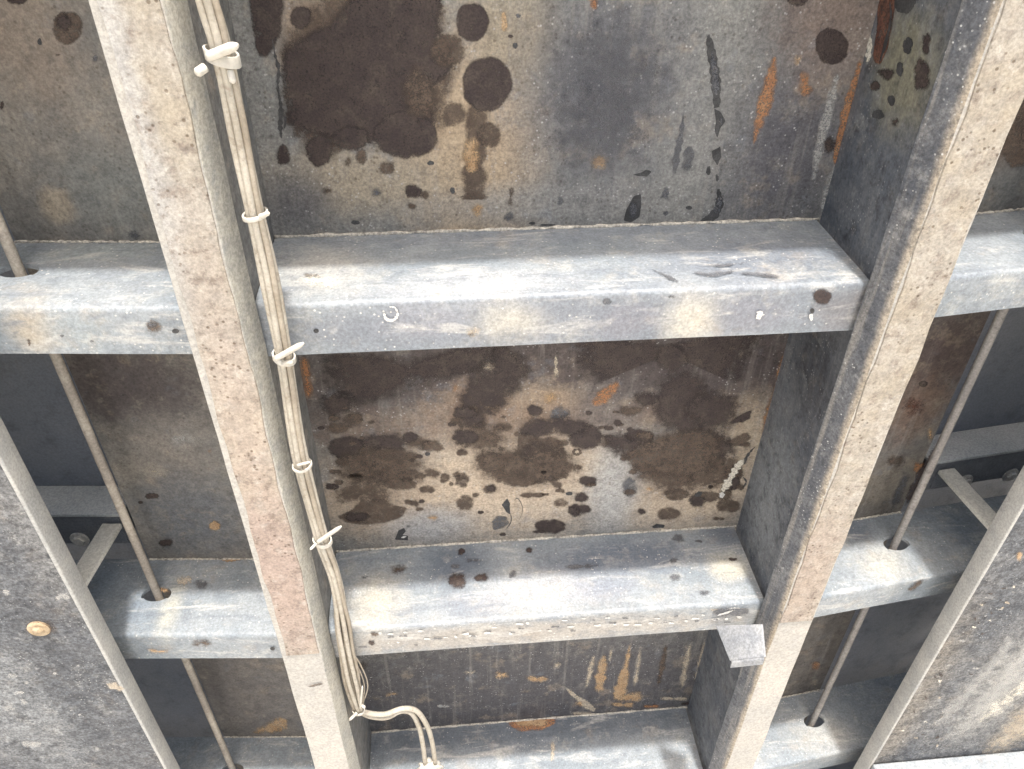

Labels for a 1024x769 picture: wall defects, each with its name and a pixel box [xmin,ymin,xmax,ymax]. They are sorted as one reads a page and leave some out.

damp [894,0,916,14]
damp [250,0,513,174]
rust [754,58,776,141]
rust [833,62,861,163]
damp [870,33,930,125]
damp [406,185,428,209]
damp [318,335,762,534]
rust [587,645,705,708]